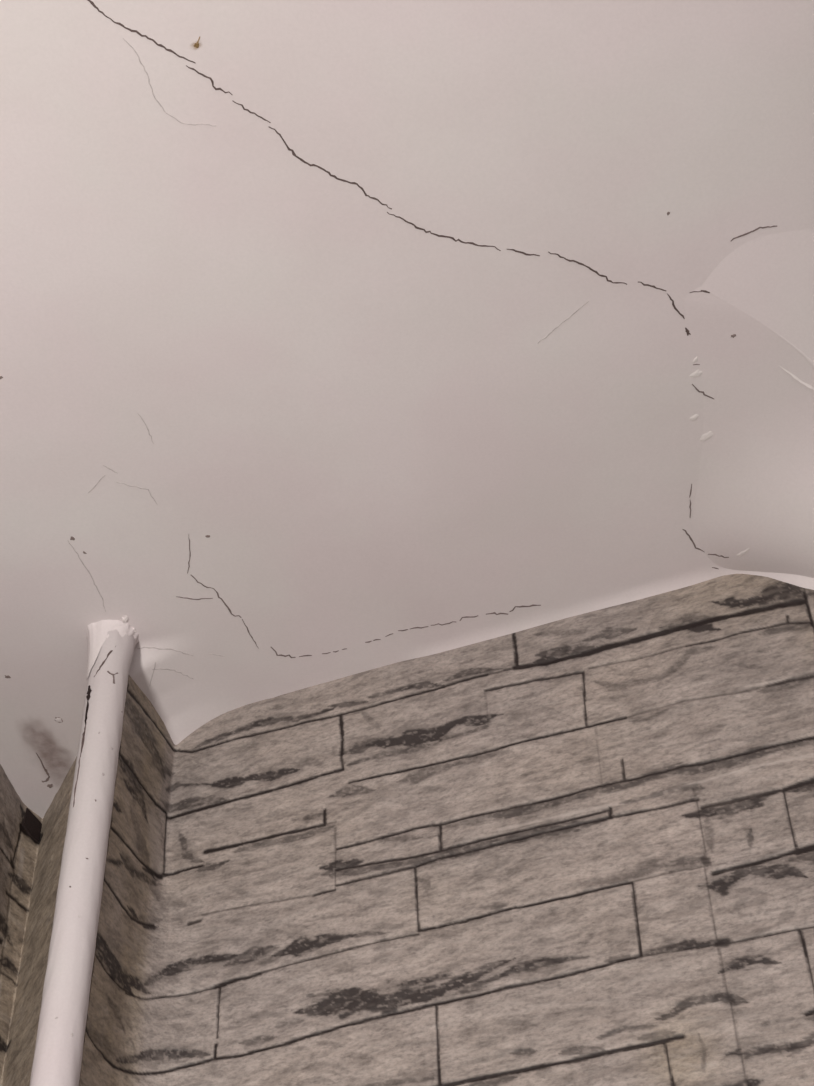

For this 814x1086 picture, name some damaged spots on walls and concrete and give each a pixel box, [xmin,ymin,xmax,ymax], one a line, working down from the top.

crack [88,0,710,336]
crack [731,226,777,241]
crack [682,484,729,569]
crack [176,539,541,658]